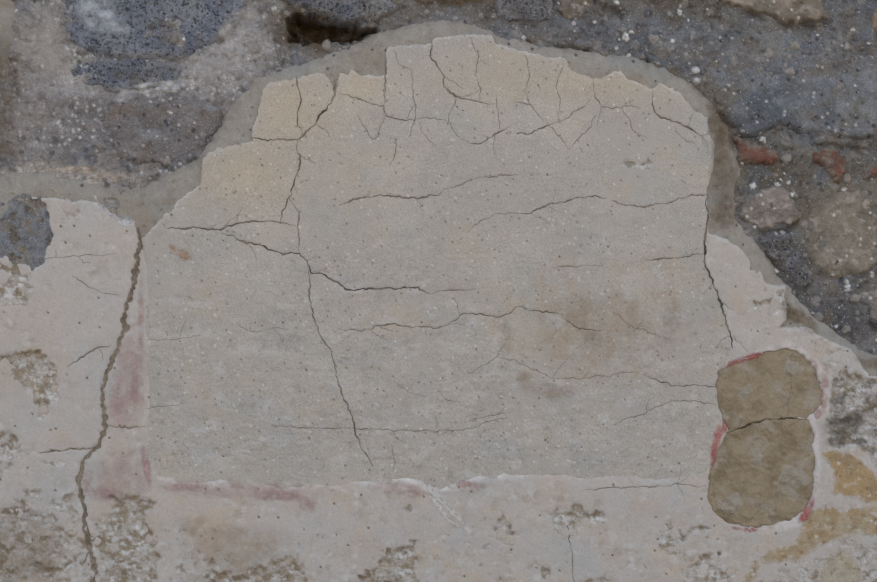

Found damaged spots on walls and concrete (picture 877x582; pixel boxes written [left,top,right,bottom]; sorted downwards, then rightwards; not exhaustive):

flaking render [0,193,54,314]
crack [167,37,720,470]
crack [467,194,801,433]
spalling [749,280,787,336]
spalling [0,430,26,479]
spalling [0,347,59,422]
crack [36,228,182,582]
crack [585,471,705,496]
spalling [655,348,877,582]